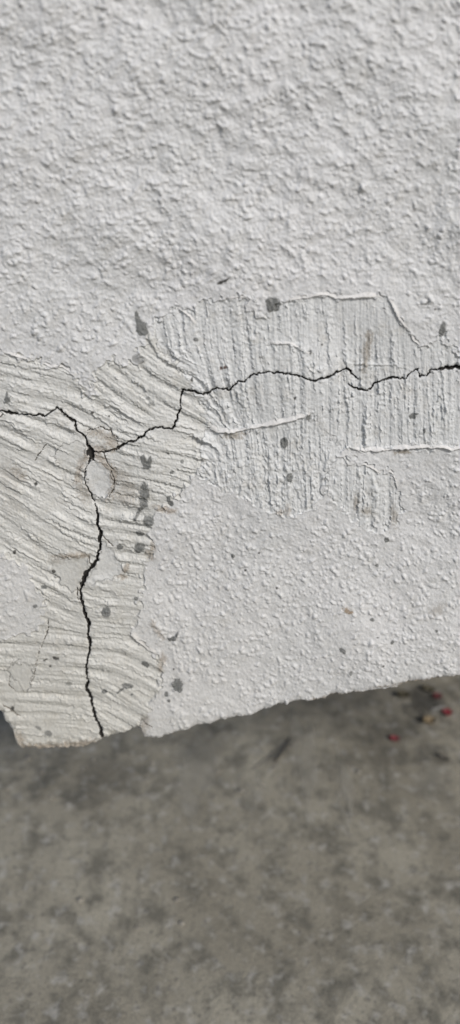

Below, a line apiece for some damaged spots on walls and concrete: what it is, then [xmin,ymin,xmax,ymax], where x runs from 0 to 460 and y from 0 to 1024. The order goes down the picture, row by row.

crack [0,364,460,738]